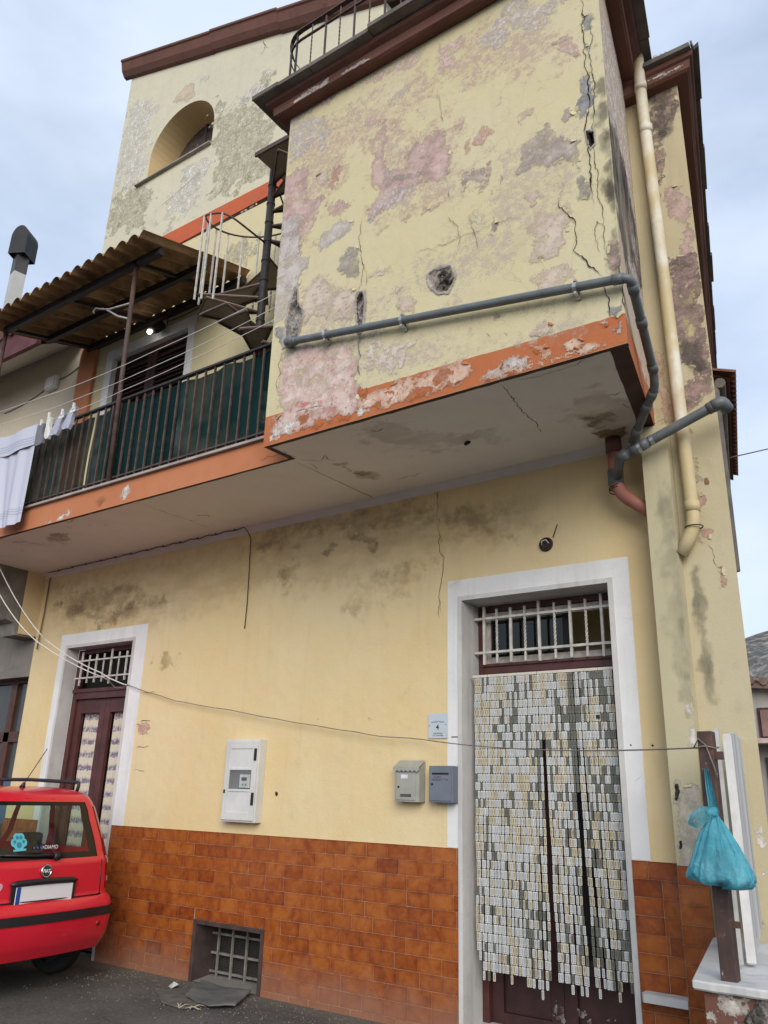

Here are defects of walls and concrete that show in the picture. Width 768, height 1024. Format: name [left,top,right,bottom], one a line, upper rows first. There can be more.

peeling [105,70,277,239]
peeling [268,0,645,441]
crack [558,1,625,323]
leakage [608,111,642,293]
peeling [647,65,713,410]